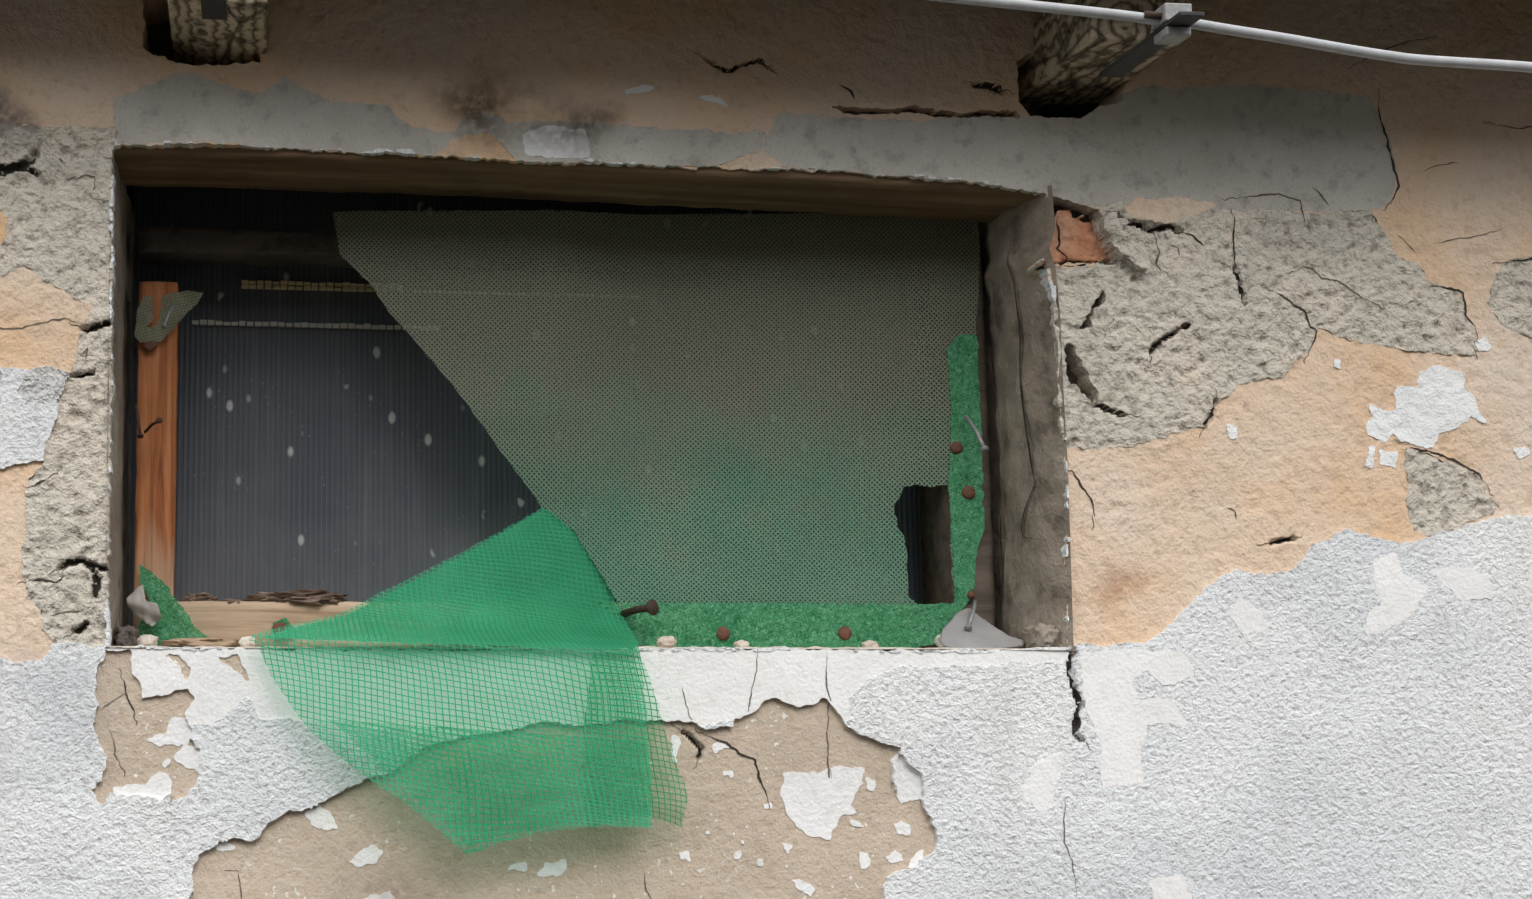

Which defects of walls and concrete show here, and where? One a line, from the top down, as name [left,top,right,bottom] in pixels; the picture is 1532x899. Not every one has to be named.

crack [694,53,778,74]
crack [963,79,1015,94]
peeling [0,0,1532,663]
crack [999,187,1385,600]
spalling [92,649,200,804]
spalling [219,654,249,681]
spalling [189,698,935,899]
crack [1066,654,1091,750]